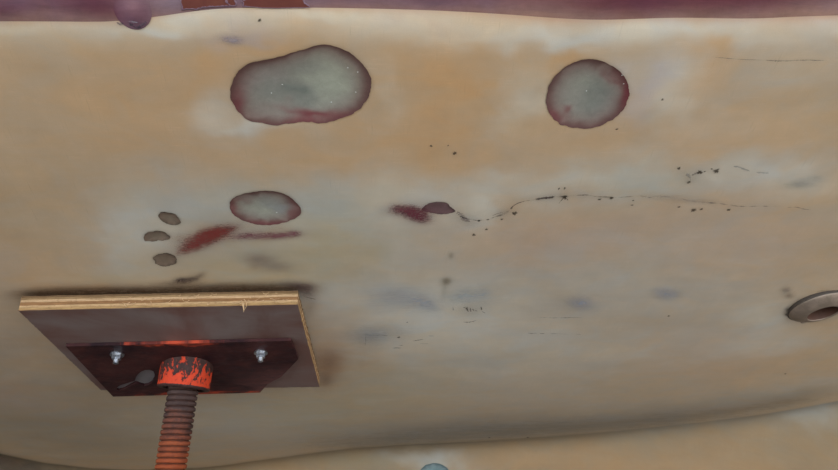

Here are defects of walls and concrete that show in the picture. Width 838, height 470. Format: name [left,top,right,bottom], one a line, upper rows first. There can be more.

peeling [180,0,310,11]
crack [457,187,568,236]